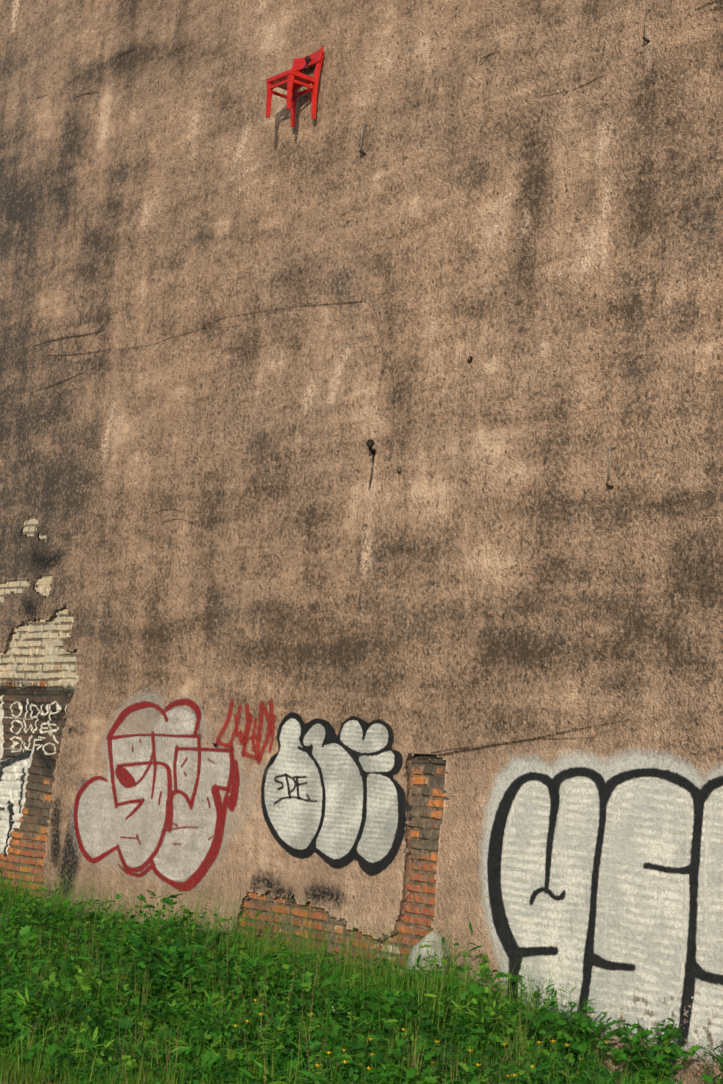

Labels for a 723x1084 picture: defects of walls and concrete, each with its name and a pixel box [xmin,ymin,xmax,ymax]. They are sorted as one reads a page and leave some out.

crack [35,324,110,391]
leakage [101,401,126,460]
flaking render [21,515,47,542]
flaking render [0,575,54,608]
flaking render [0,603,82,901]
flaking render [240,752,450,984]